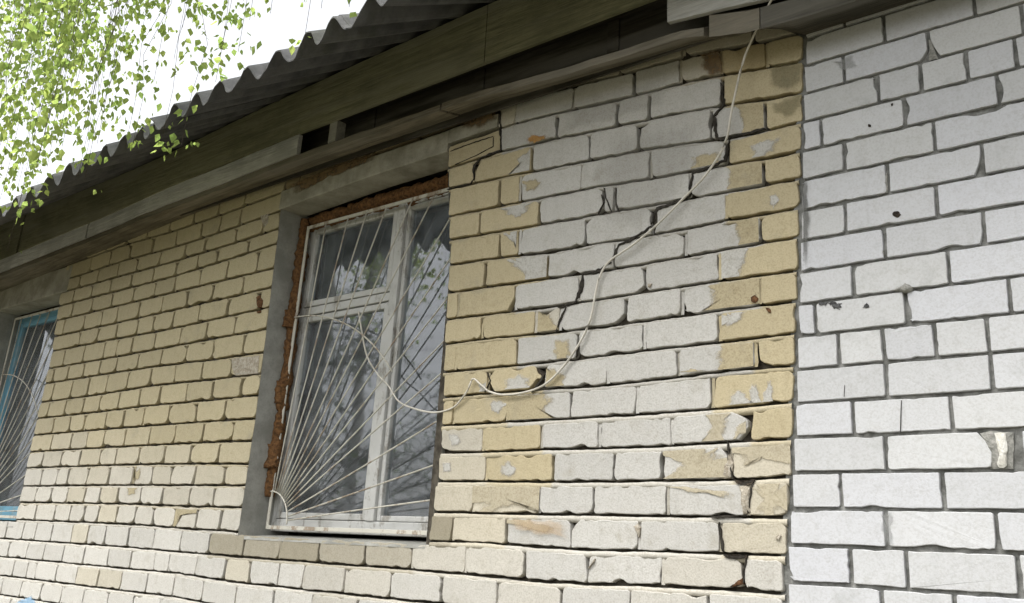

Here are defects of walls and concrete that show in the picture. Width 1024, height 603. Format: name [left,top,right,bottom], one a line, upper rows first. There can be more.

crack [447,111,502,190]
peeling [691,138,779,189]
peeling [736,102,764,133]
peeling [503,231,547,280]
crack [555,82,767,358]
peeling [702,218,760,325]
peeling [490,312,570,420]
crack [532,370,546,392]
peeling [718,342,753,370]
peeling [663,381,791,515]
spalling [980,431,1015,470]
crack [710,441,754,587]